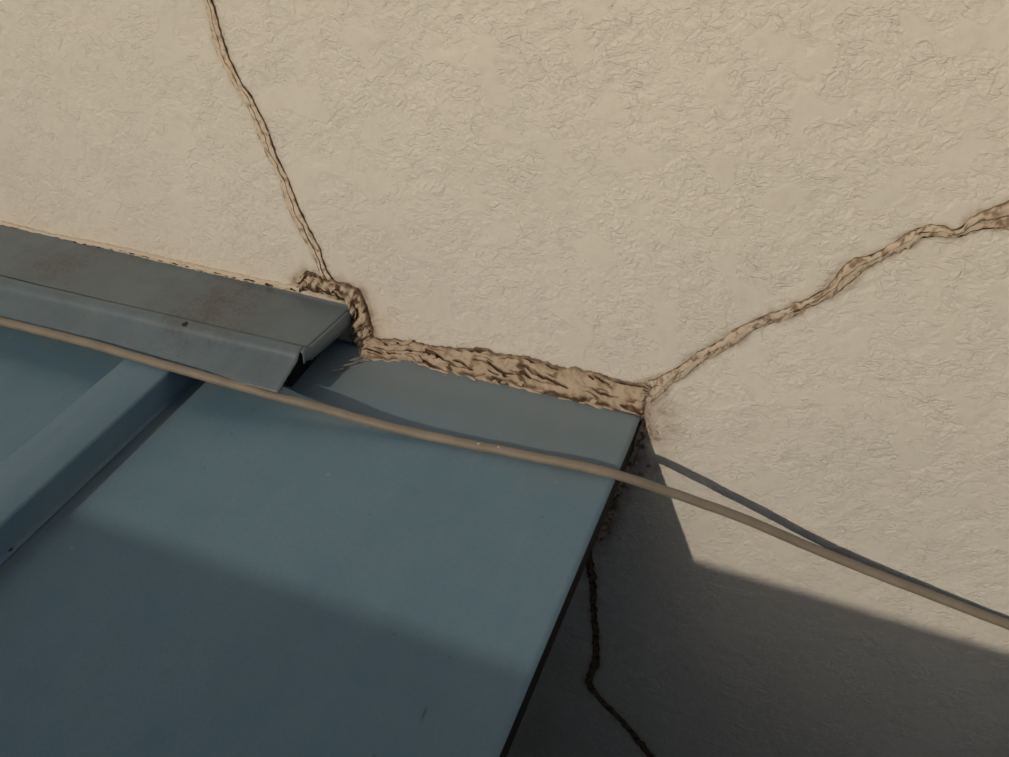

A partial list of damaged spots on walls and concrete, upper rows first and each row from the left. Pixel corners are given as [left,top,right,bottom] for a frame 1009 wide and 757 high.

crack [204,0,371,338]
crack [636,200,1009,434]
crack [585,551,654,757]